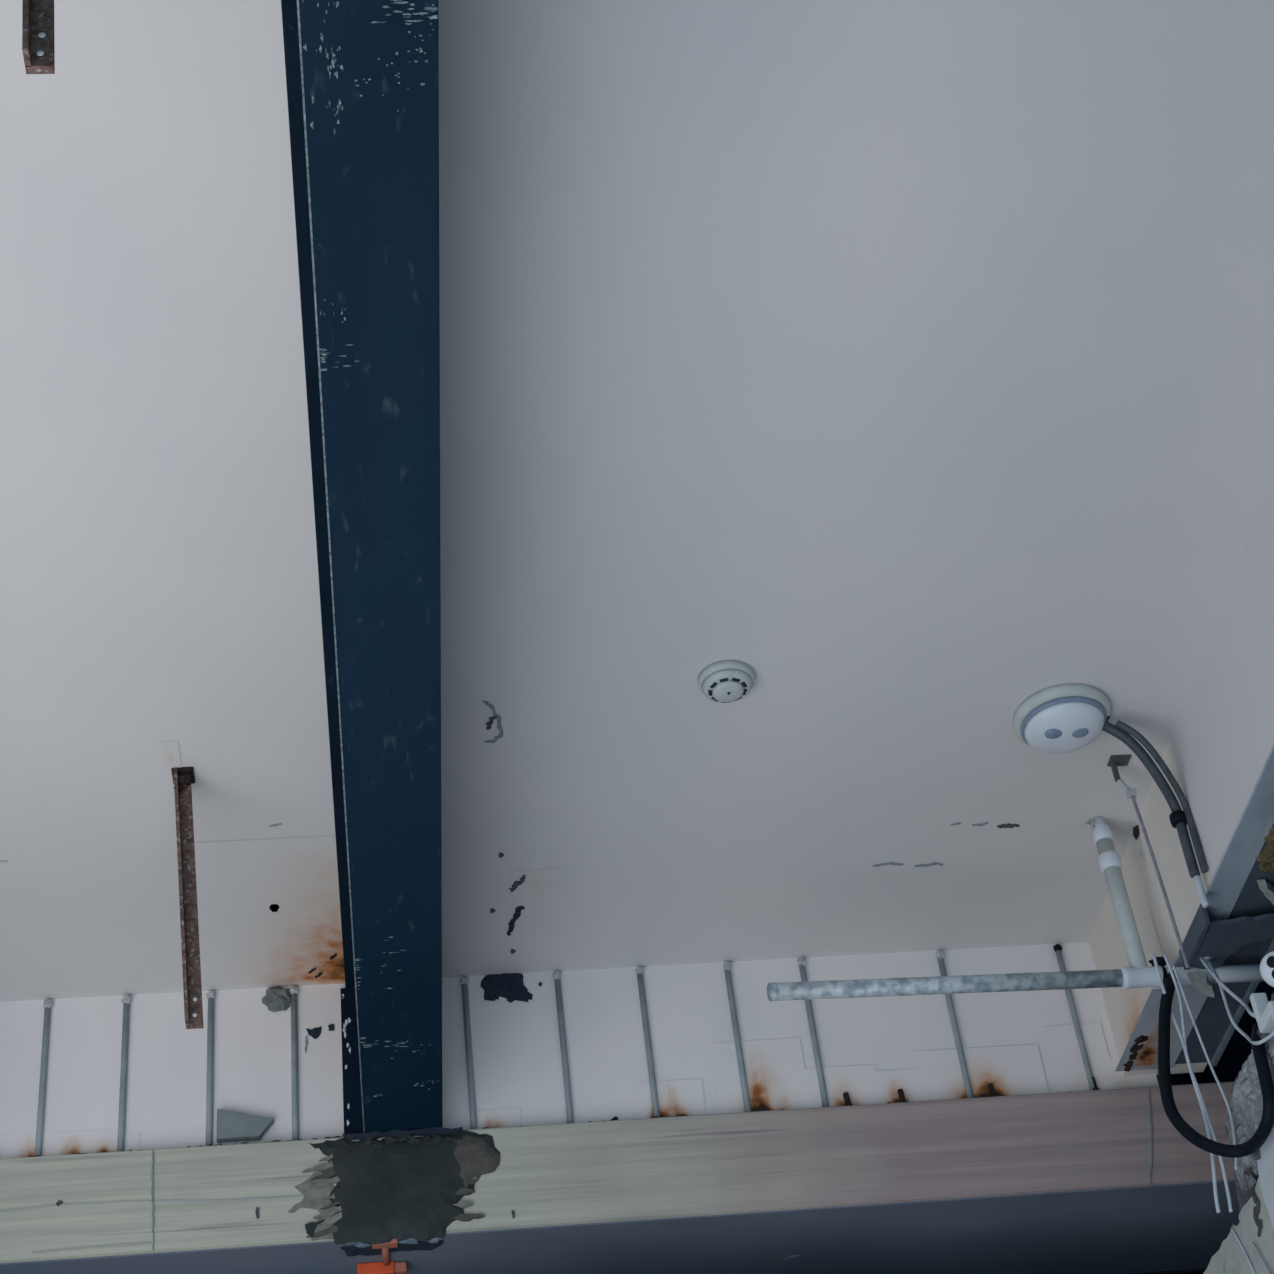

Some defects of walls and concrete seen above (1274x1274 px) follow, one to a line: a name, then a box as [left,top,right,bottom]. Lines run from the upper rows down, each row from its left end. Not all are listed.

corrosion [194,836,345,991]
corrosion [441,829,471,978]
peeling [507,906,525,954]
peeling [1257,879,1274,905]
peeling [480,973,542,1006]
corrosion [633,986,1212,1119]
spalling [1225,1028,1274,1190]
corrosion [2,1129,140,1159]
spalling [341,1237,443,1257]